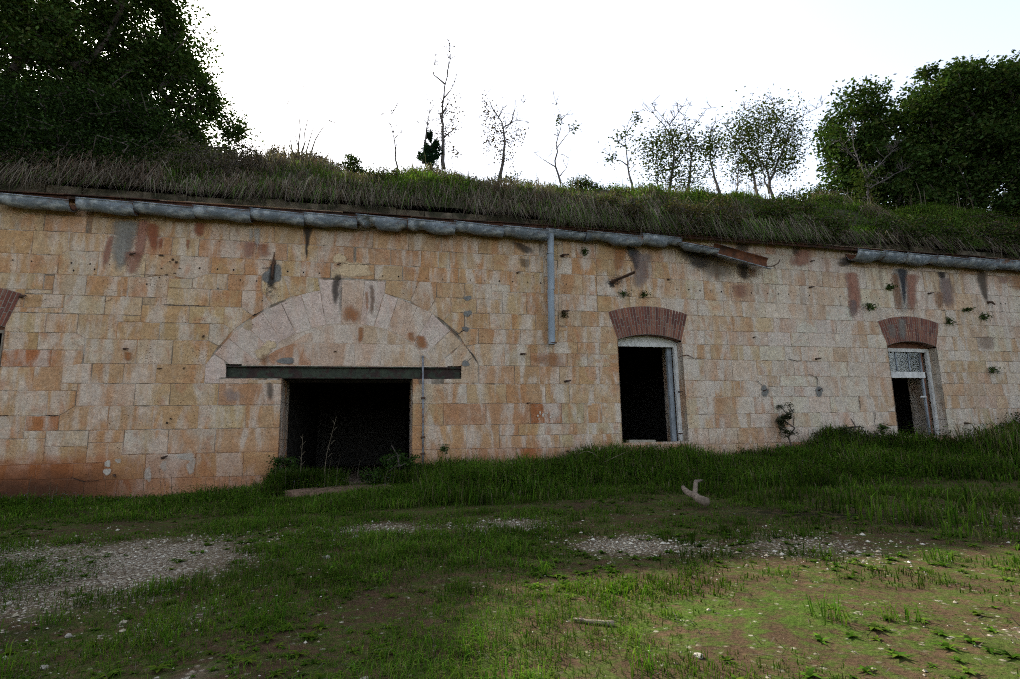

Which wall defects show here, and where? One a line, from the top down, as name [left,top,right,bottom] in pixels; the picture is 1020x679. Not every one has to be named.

leakage [104,221,149,273]
leakage [840,258,861,315]
leakage [893,268,916,337]
leakage [938,272,952,304]